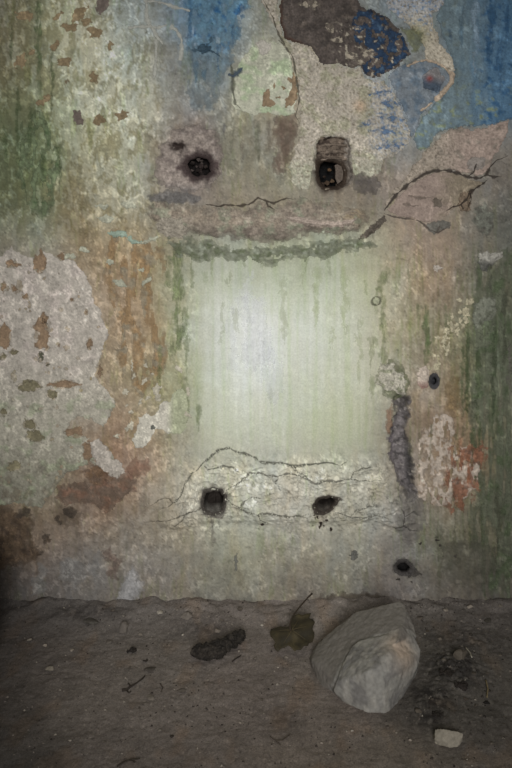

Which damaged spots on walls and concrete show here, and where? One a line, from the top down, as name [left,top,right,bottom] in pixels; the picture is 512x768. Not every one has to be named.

spalling [228,0,455,192]
crack [206,197,290,210]
crack [384,156,507,233]
water stain [169,238,373,348]
peeling [0,246,192,508]
water stain [384,360,409,400]
water stain [462,256,512,598]
crack [152,447,380,525]
crack [335,505,420,531]
rust [445,442,488,514]